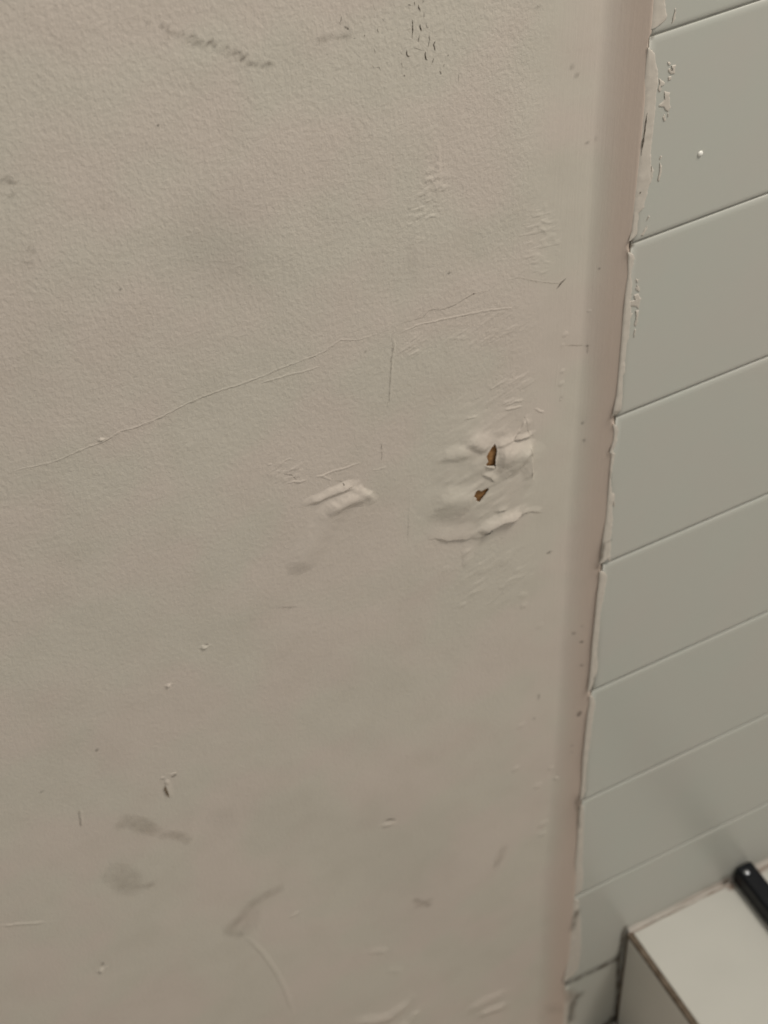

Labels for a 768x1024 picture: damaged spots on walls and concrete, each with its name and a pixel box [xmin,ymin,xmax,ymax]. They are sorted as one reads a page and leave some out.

crack [8,276,564,474]
peeling [415,387,547,546]